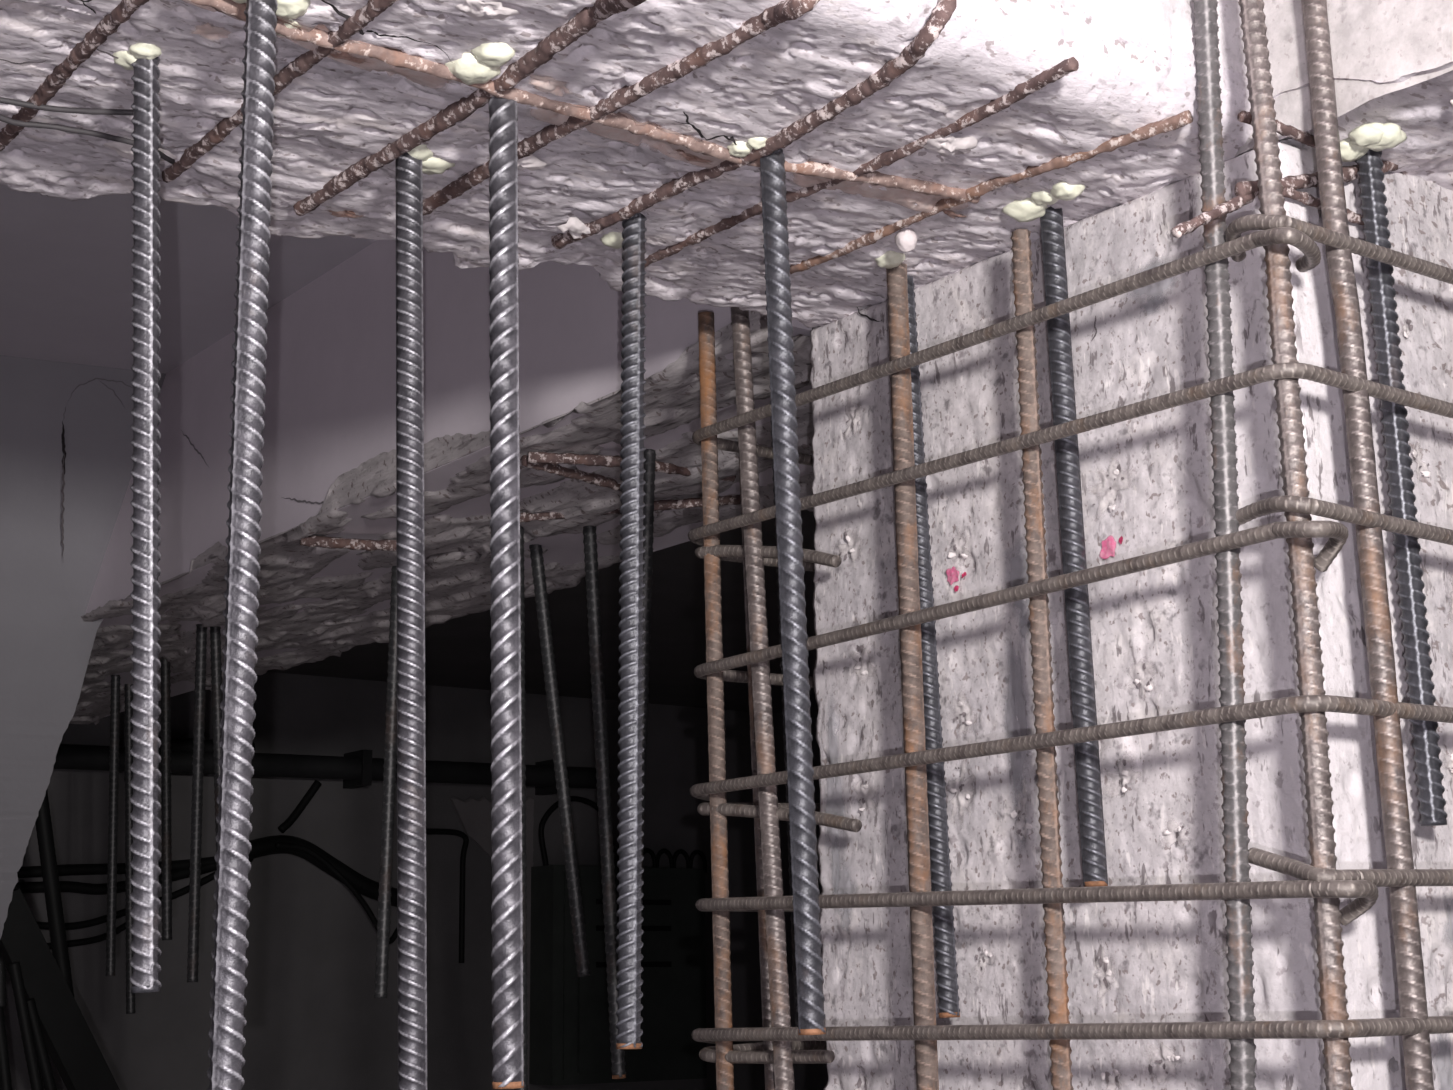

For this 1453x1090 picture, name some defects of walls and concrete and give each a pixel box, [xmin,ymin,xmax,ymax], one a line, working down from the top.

rust [0,0,149,151]
rust [162,103,243,183]
rust [183,0,247,22]
rust [273,0,1193,274]
spalling [1219,65,1253,162]
crack [61,378,133,563]
spalling [0,0,626,1090]
spalling [514,0,1201,1049]
spalling [1100,1069,1121,1090]
spalling [1148,1043,1180,1083]